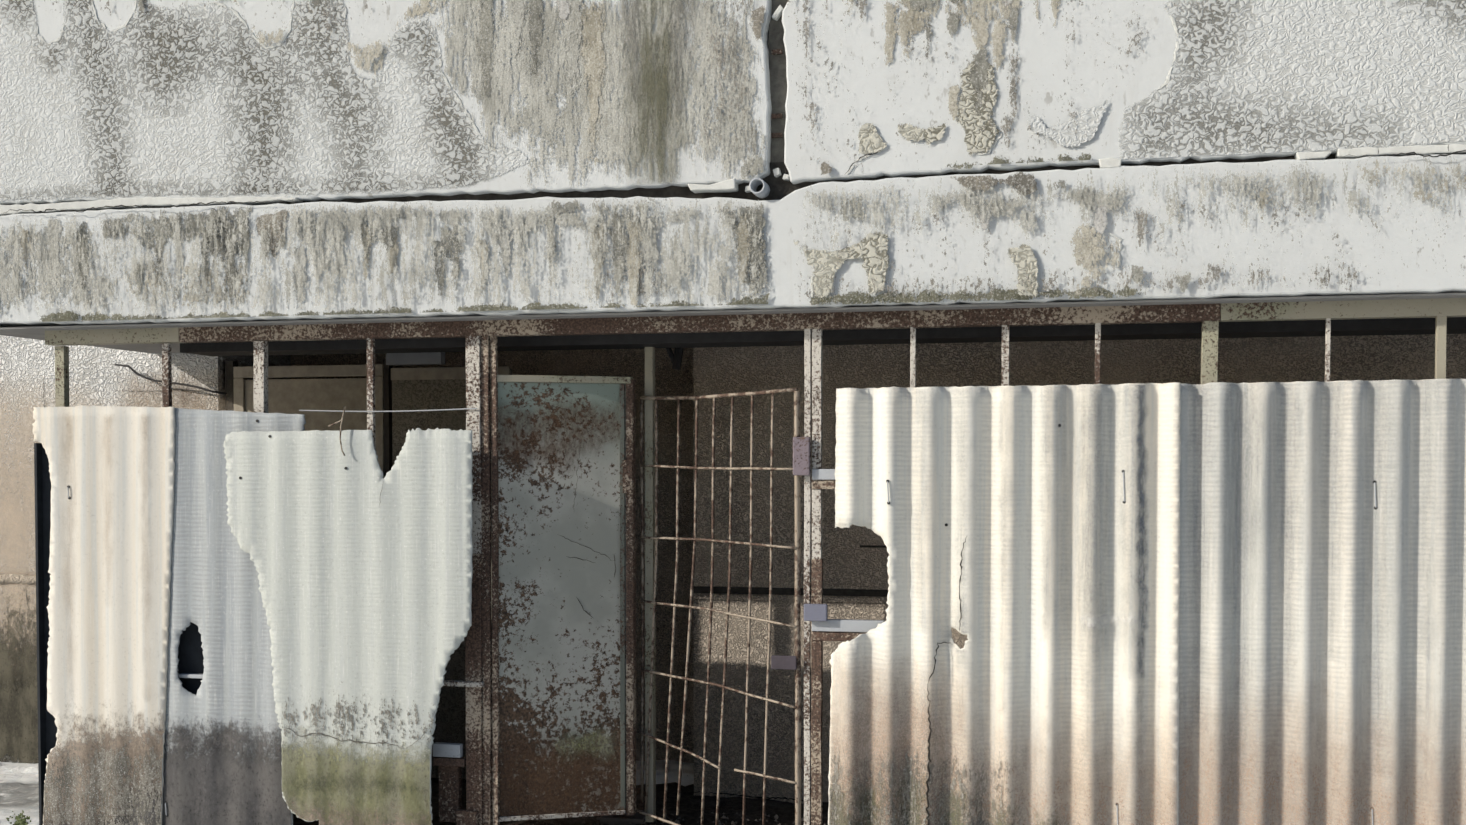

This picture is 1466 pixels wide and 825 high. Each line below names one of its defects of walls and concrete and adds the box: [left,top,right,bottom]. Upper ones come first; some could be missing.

leakage [69,0,122,193]
leakage [136,0,205,93]
leakage [228,22,287,191]
leakage [304,0,478,179]
leakage [562,0,712,177]
leakage [842,0,1061,71]
leakage [1188,0,1225,68]
leakage [1146,110,1269,144]
leakage [134,210,400,308]
leakage [709,203,771,297]
leakage [0,406,435,825]
crack [926,537,967,825]